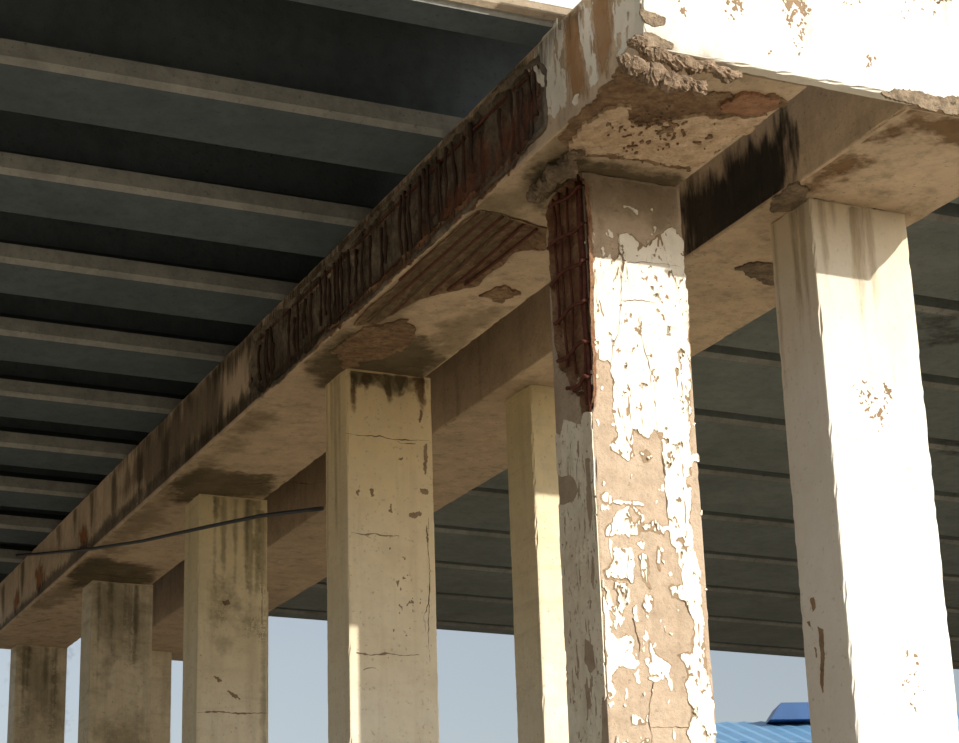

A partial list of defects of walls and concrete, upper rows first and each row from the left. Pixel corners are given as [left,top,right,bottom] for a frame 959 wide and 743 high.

peeling [782,0,812,56]
leakage [545,108,798,256]
spalling [770,181,810,213]
leakage [307,334,445,405]
peeling [248,0,788,743]
leakage [172,468,273,502]
leakage [68,559,155,587]
crack [352,518,430,670]
crack [647,682,696,743]